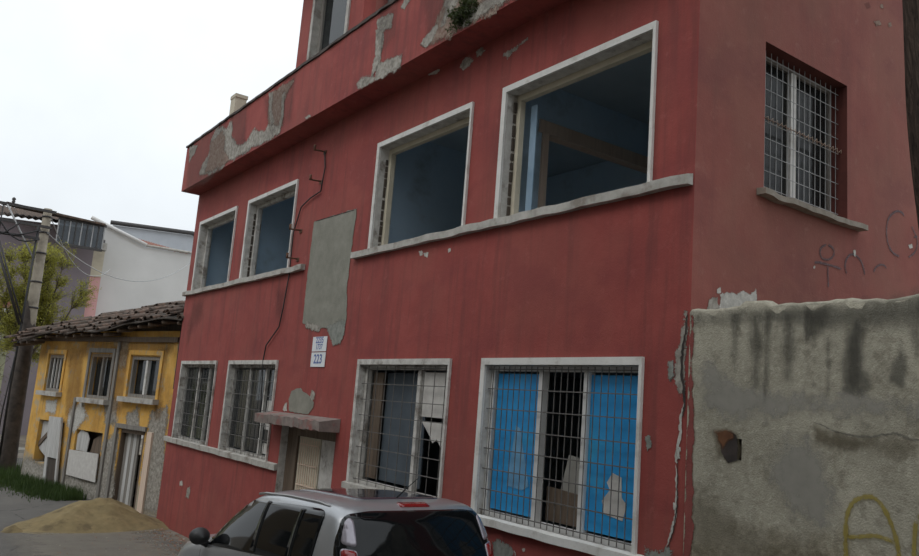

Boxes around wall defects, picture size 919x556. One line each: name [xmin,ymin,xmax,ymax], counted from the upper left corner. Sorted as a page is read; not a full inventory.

peeling [356,0,410,90]
flaking render [420,0,510,49]
peeling [199,78,294,177]
peeling [21,457,44,480]
peeling [45,399,57,414]
peeling [64,397,170,516]
peeling [283,388,315,415]
crack [666,311,690,546]
spalling [720,433,738,463]
peeling [492,539,525,556]